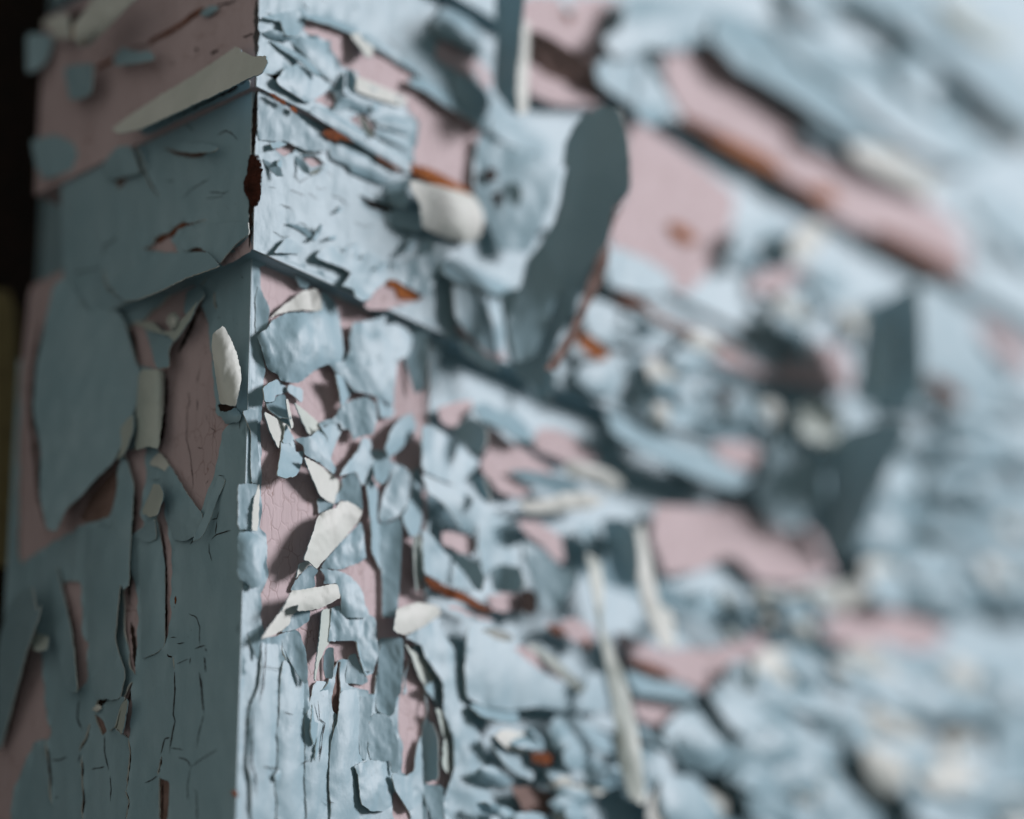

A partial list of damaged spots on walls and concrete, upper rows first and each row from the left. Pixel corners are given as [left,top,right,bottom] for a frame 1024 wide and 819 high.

rust [243,154,263,207]
rust [270,93,297,114]
rust [322,129,353,142]
rust [376,155,472,195]
peeling [0,0,630,819]
peeling [524,0,1024,819]
crack [47,614,216,819]
crack [303,661,340,764]